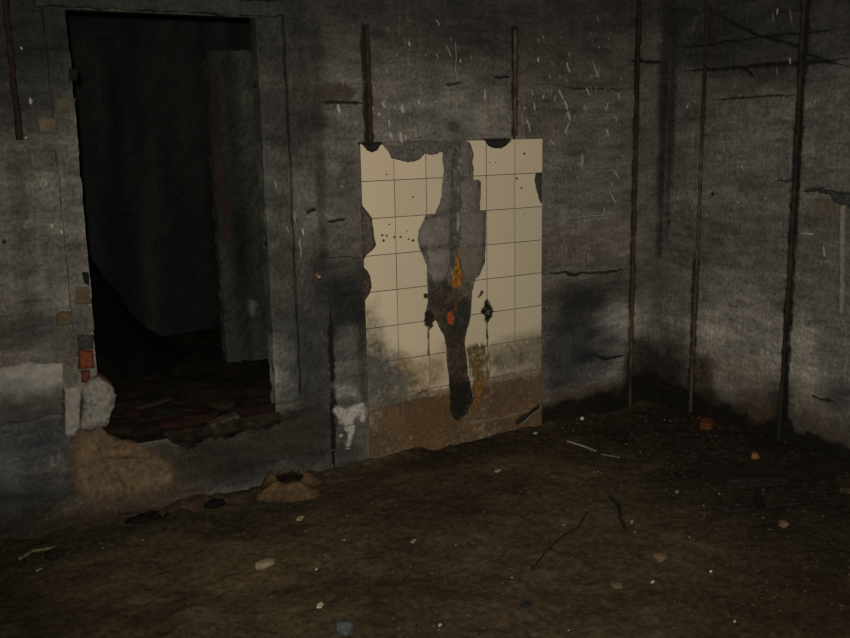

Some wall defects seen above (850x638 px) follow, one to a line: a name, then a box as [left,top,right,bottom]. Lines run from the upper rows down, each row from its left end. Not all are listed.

crack [631,0,850,100]
spalling [358,120,485,421]
rust [447,250,463,325]
crack [542,268,626,276]
peeling [0,334,112,437]
leakage [333,290,850,460]